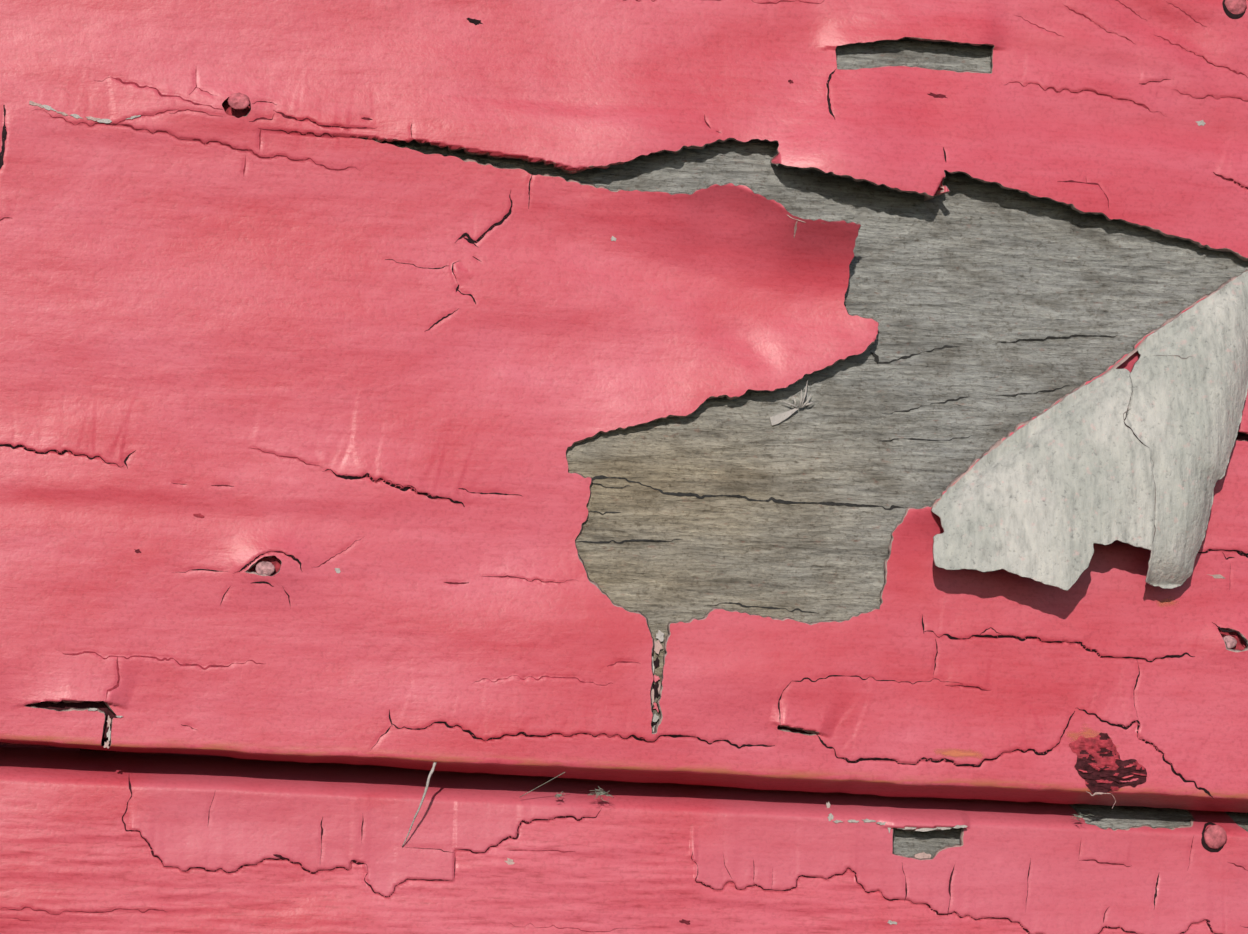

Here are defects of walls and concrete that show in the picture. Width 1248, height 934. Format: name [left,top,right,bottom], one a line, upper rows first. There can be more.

peeling [835,37,995,74]
crack [0,77,373,174]
crack [385,173,533,332]
crack [0,444,136,469]
crack [252,448,522,507]
peeling [352,136,1248,734]
peeling [88,708,123,748]
crack [372,616,1214,799]
crack [122,779,602,897]
crack [691,853,1042,934]
peeling [826,801,968,860]
crack [1079,836,1194,908]